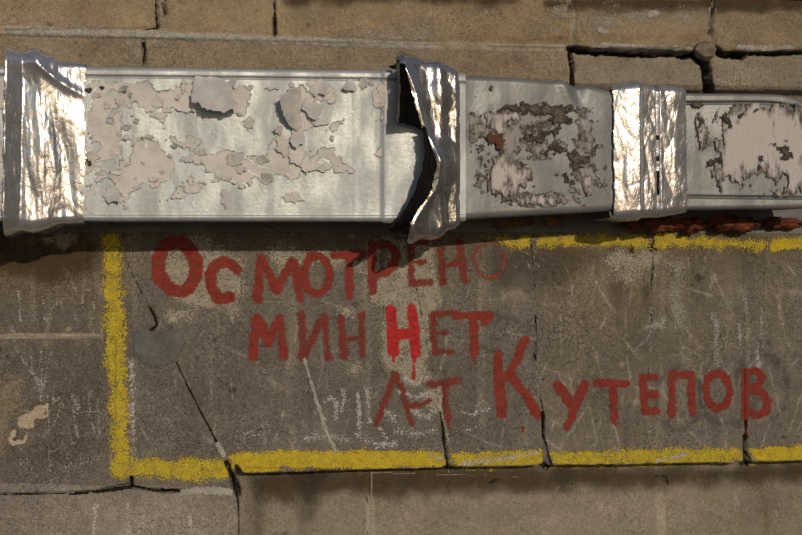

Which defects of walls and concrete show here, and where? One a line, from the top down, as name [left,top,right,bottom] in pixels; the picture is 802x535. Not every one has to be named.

peeling [85,86,111,109]
peeling [175,76,238,113]
peeling [264,86,303,131]
peeling [167,143,206,163]
peeling [215,153,247,209]
peeling [257,155,273,185]
peeling [281,192,305,203]
crack [128,265,158,331]
crack [416,287,449,467]
crack [176,361,218,443]
crack [1,477,180,495]
crack [224,461,240,535]